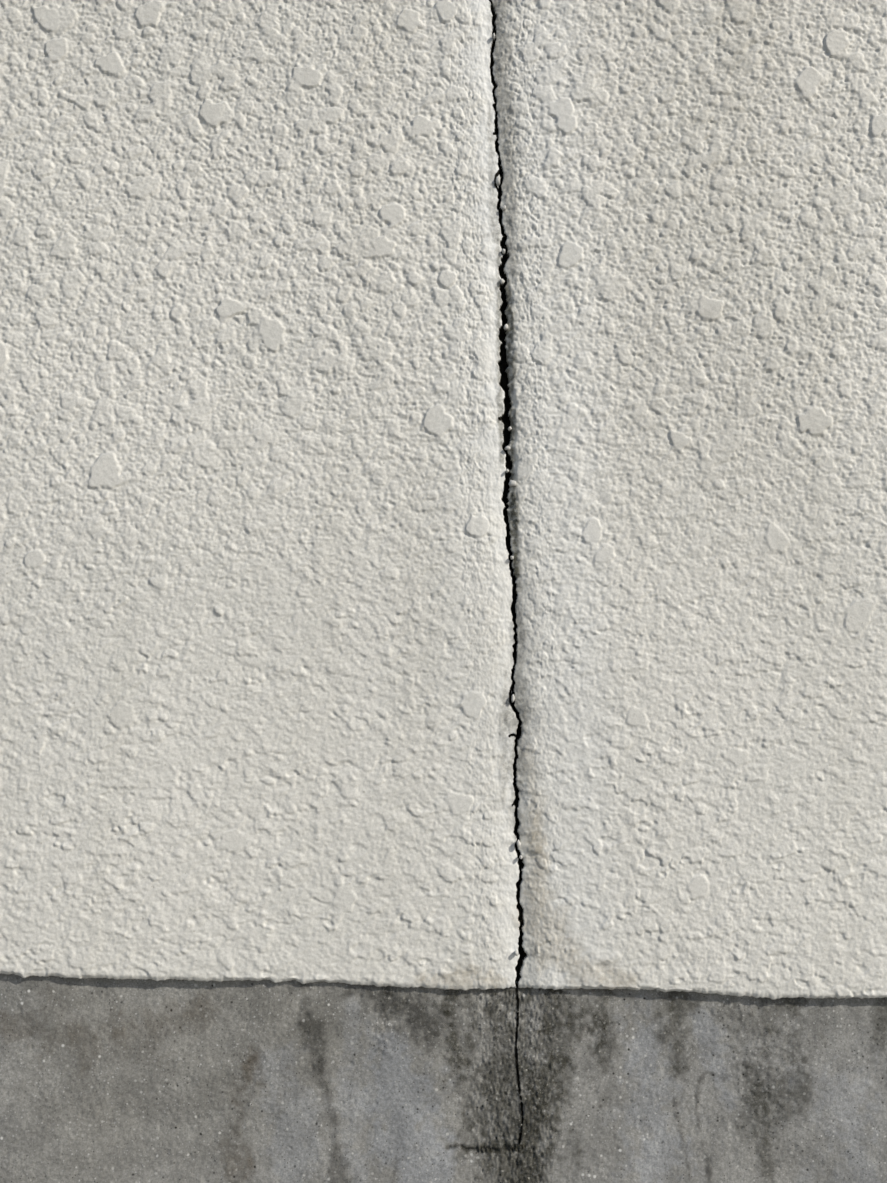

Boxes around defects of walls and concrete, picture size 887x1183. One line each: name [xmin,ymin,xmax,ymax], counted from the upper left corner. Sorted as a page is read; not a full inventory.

crack [489,0,527,1145]
water stain [469,1055,548,1183]